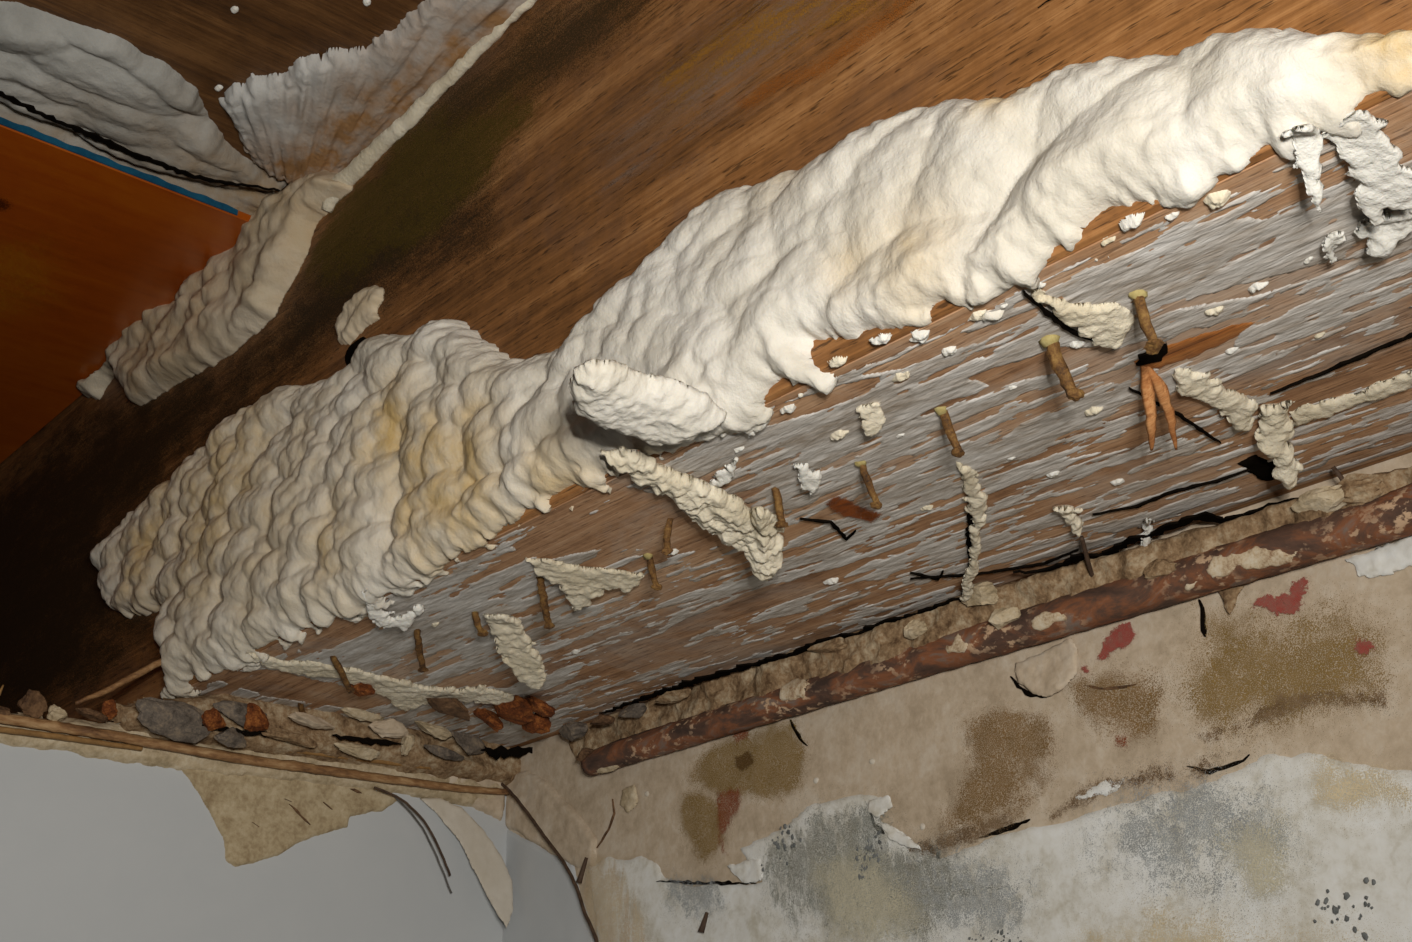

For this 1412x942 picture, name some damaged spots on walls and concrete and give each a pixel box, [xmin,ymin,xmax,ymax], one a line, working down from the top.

corrosion [825,496,883,523]
crack [599,387,1299,714]
peeling [0,652,597,927]
water stain [583,844,652,942]
water stain [660,588,1412,942]